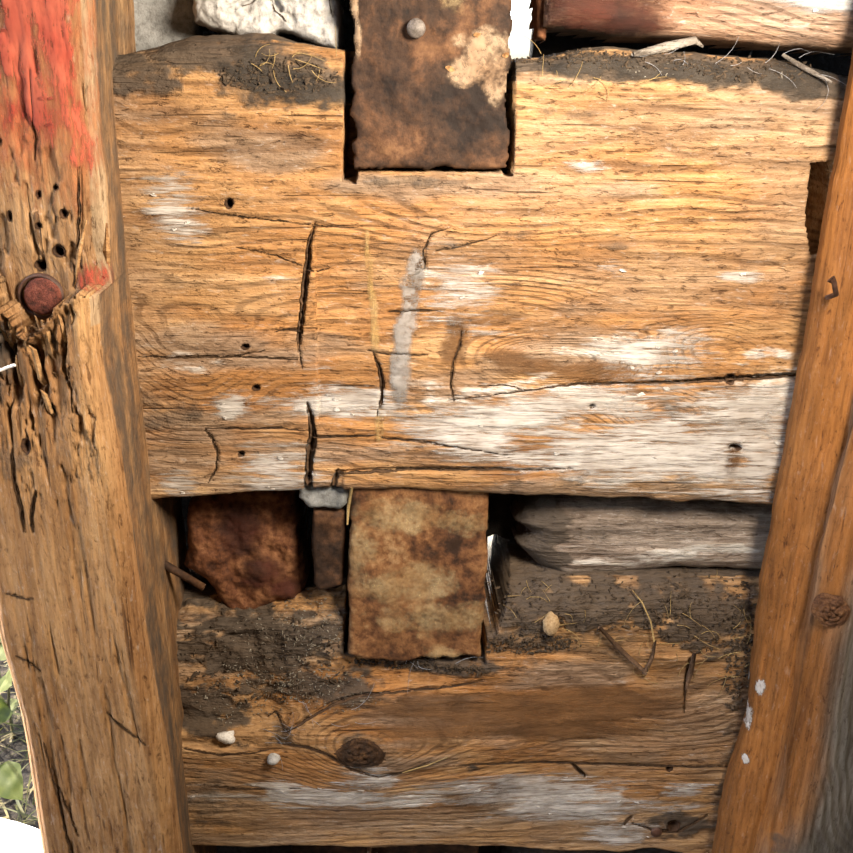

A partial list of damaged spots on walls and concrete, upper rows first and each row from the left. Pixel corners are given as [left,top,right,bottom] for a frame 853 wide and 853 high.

peeling [0,0,94,171]
peeling [77,266,111,293]
crack [138,208,359,368]
crack [389,307,438,315]
crack [423,227,497,268]
crack [449,333,796,400]
crack [206,349,566,486]